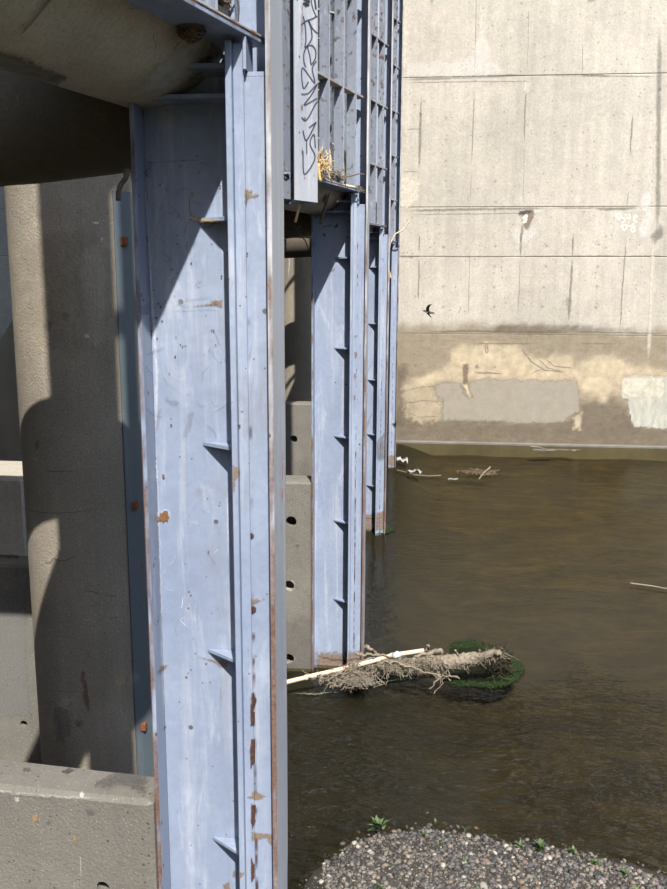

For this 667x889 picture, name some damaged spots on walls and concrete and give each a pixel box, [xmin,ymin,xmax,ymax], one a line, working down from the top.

damp [396,245,667,445]
peeling [622,378,664,398]
corrosion [311,361,397,675]